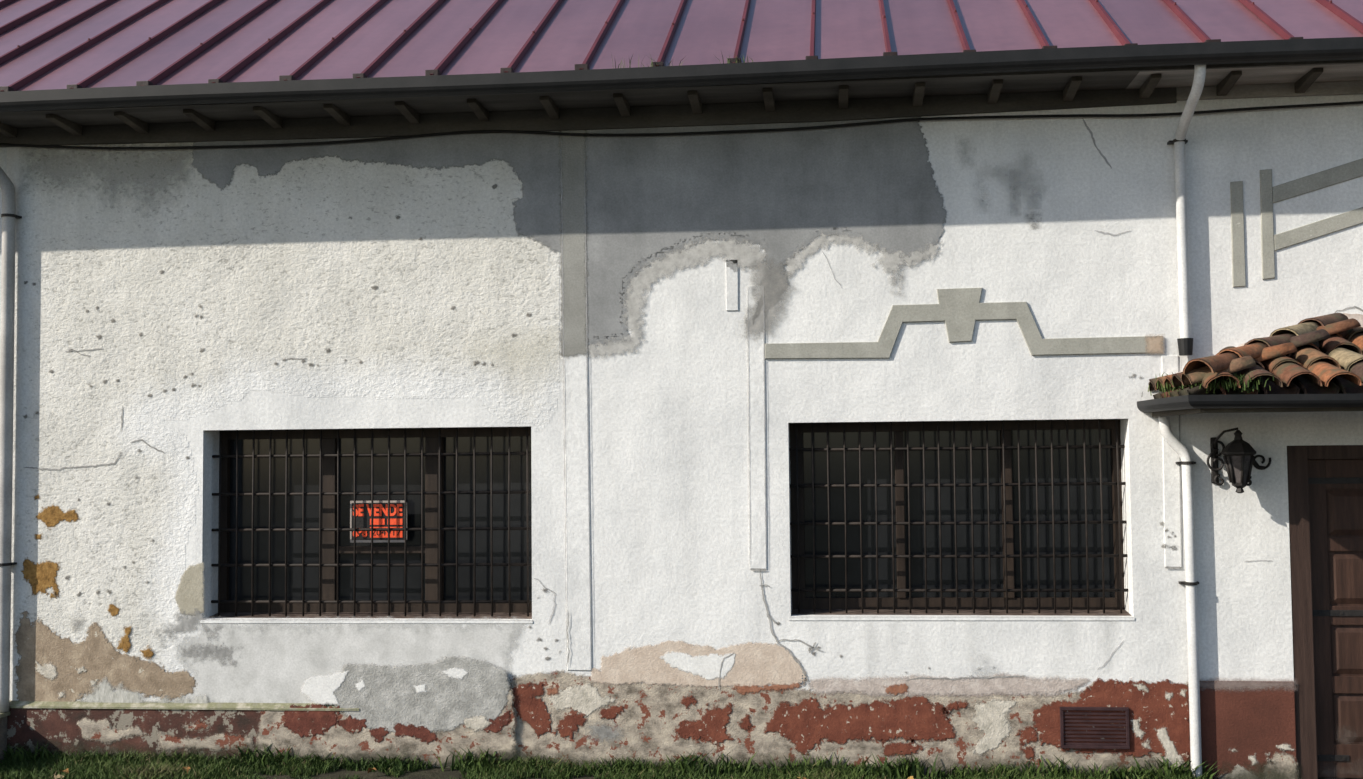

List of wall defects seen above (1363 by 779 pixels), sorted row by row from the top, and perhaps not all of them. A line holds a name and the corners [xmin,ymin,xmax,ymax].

crack [1082,118,1112,169]
peeling [192,117,946,357]
spalling [15,611,208,703]
flaking render [77,626,1191,773]
crack [760,572,821,683]